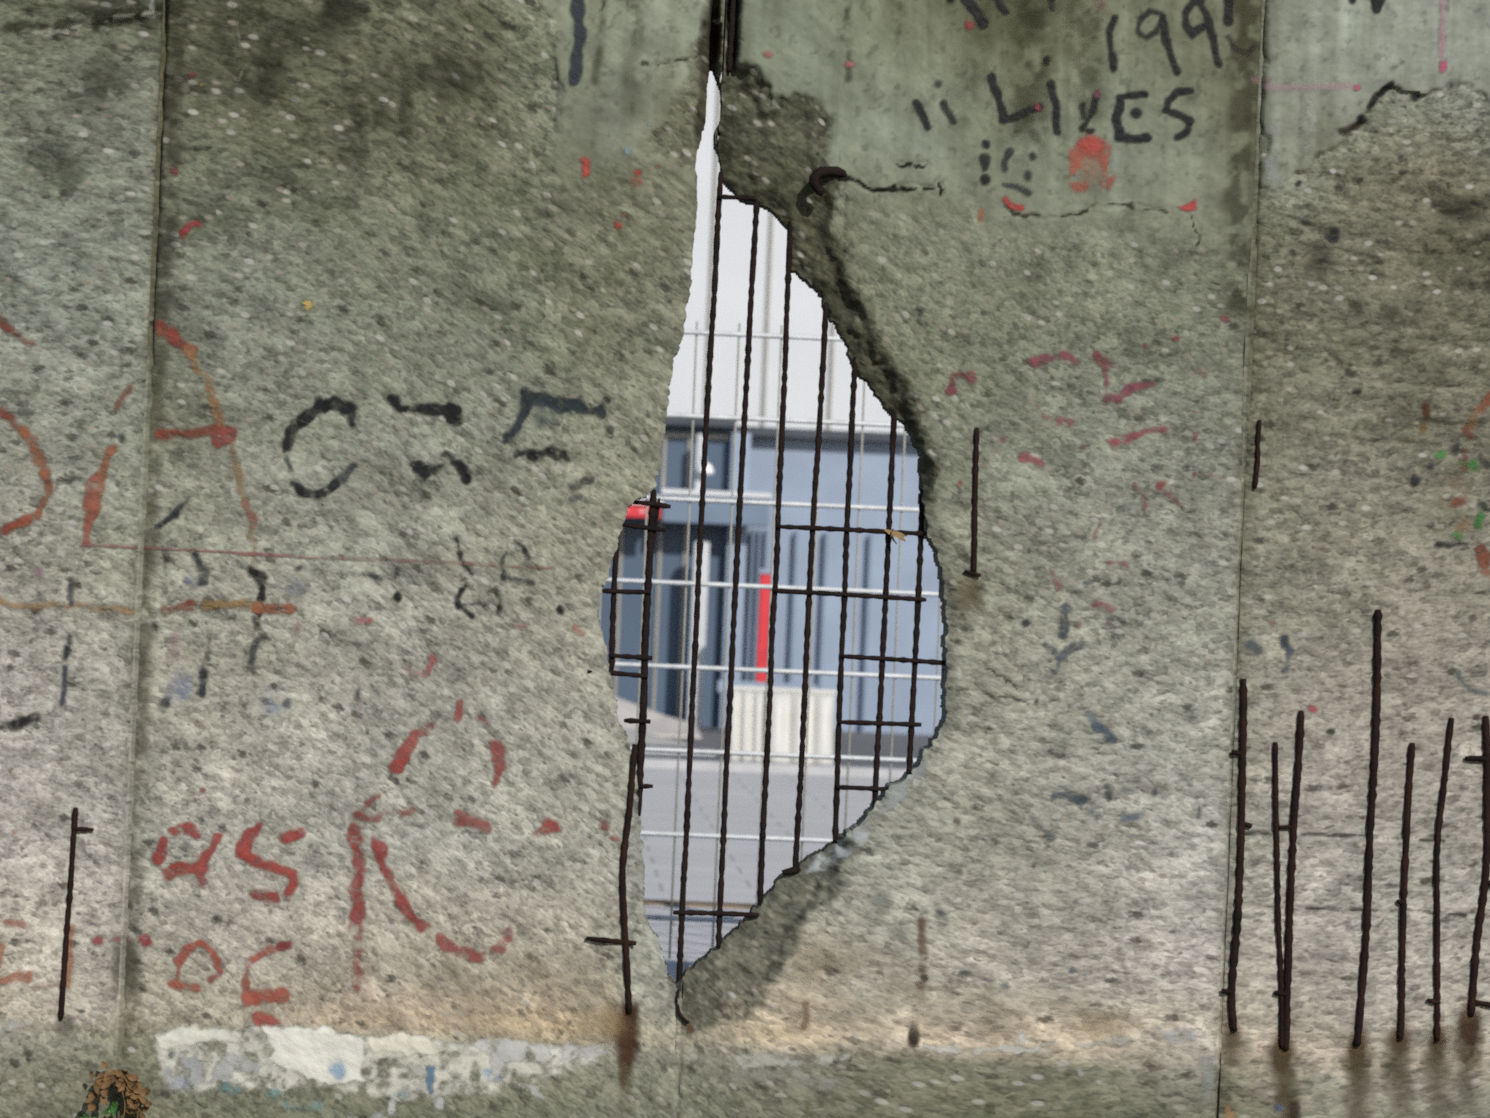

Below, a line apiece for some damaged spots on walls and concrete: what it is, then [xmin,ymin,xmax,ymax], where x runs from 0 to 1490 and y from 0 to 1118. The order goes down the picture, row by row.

crack [838,162,943,196]
spalling [1270,88,1490,239]
crack [1010,203,1200,246]
spalling [1253,420,1262,489]
spalling [586,0,946,1034]
rust [918,918,928,989]
rust [617,1005,638,1081]
rust [909,1026,919,1045]
rust [1389,1035,1408,1086]
rust [1430,1010,1477,1077]